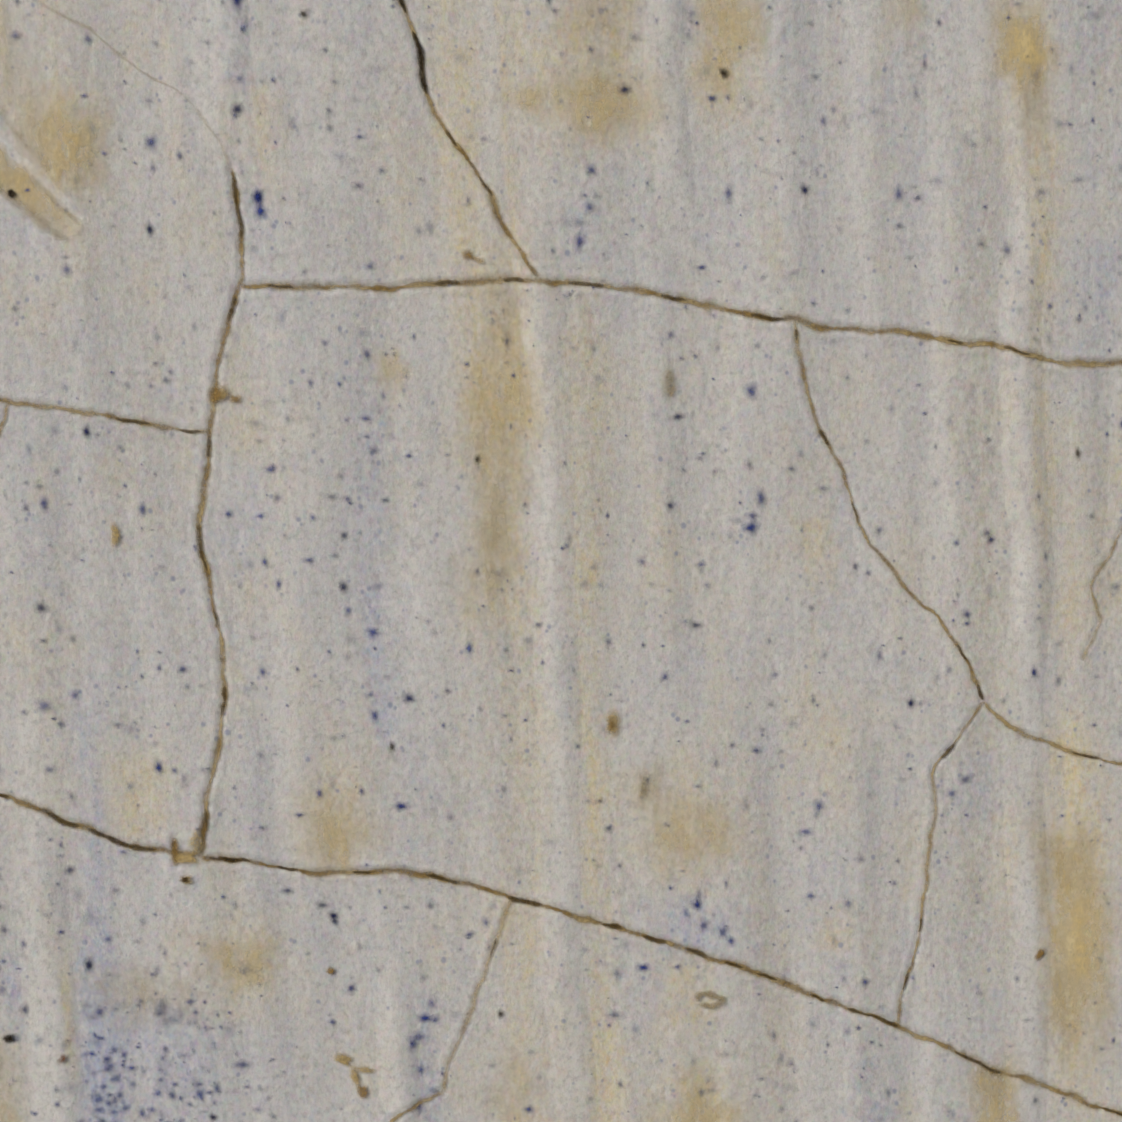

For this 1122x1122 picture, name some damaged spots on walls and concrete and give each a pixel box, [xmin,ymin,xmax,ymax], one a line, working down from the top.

crack [0,0,1122,850]
crack [0,794,177,862]
crack [201,799,1122,1122]